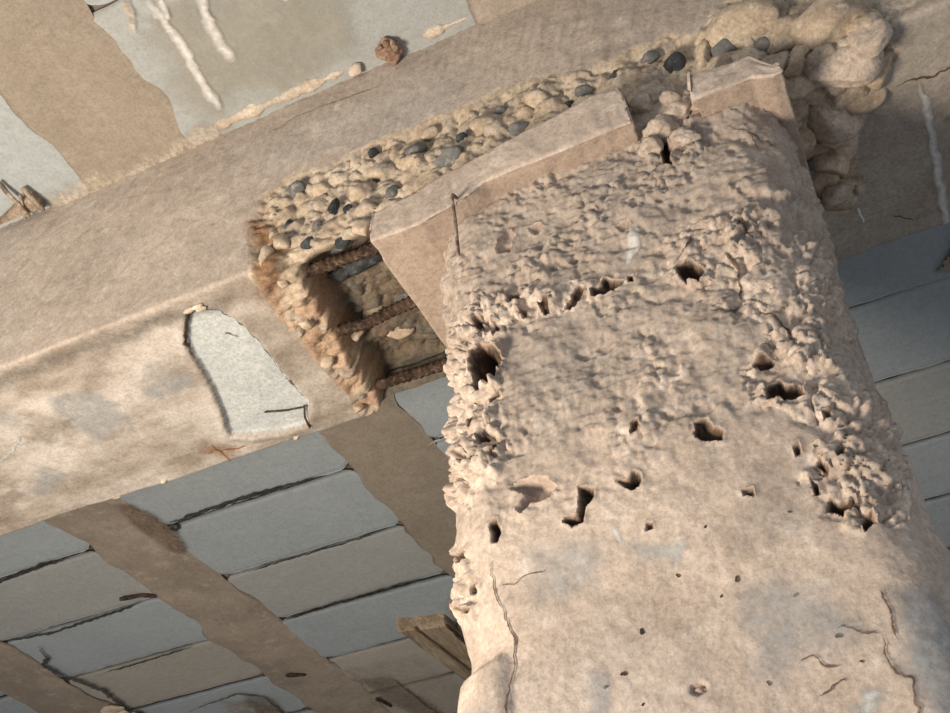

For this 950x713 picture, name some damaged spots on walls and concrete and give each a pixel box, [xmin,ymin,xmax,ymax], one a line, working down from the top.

water stain [150,0,342,107]
crack [899,67,950,86]
corrosion [307,243,379,278]
spalling [245,0,897,418]
water stain [919,87,950,225]
corrosion [336,296,417,336]
peeling [183,303,310,440]
corrosion [374,357,447,391]
crack [490,562,545,713]
crack [801,655,847,696]
crack [839,591,921,713]